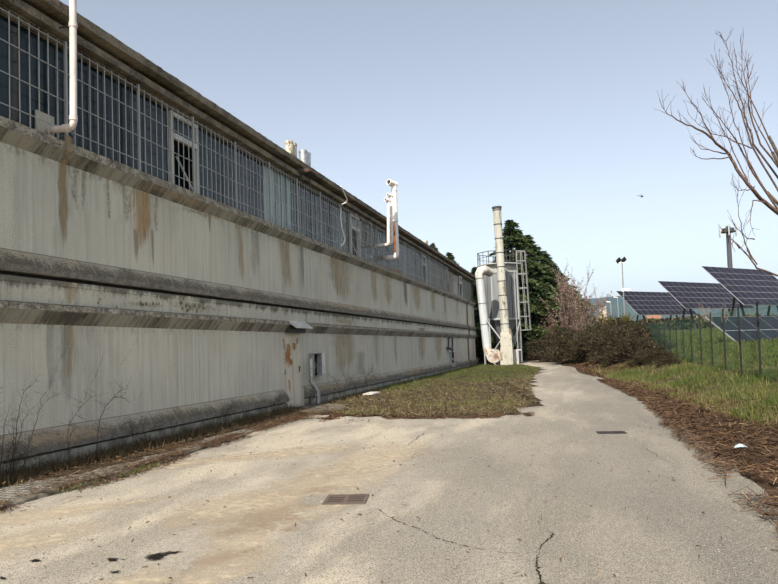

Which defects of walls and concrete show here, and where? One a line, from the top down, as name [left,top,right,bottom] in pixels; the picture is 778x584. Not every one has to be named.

crack [534,514,555,584]